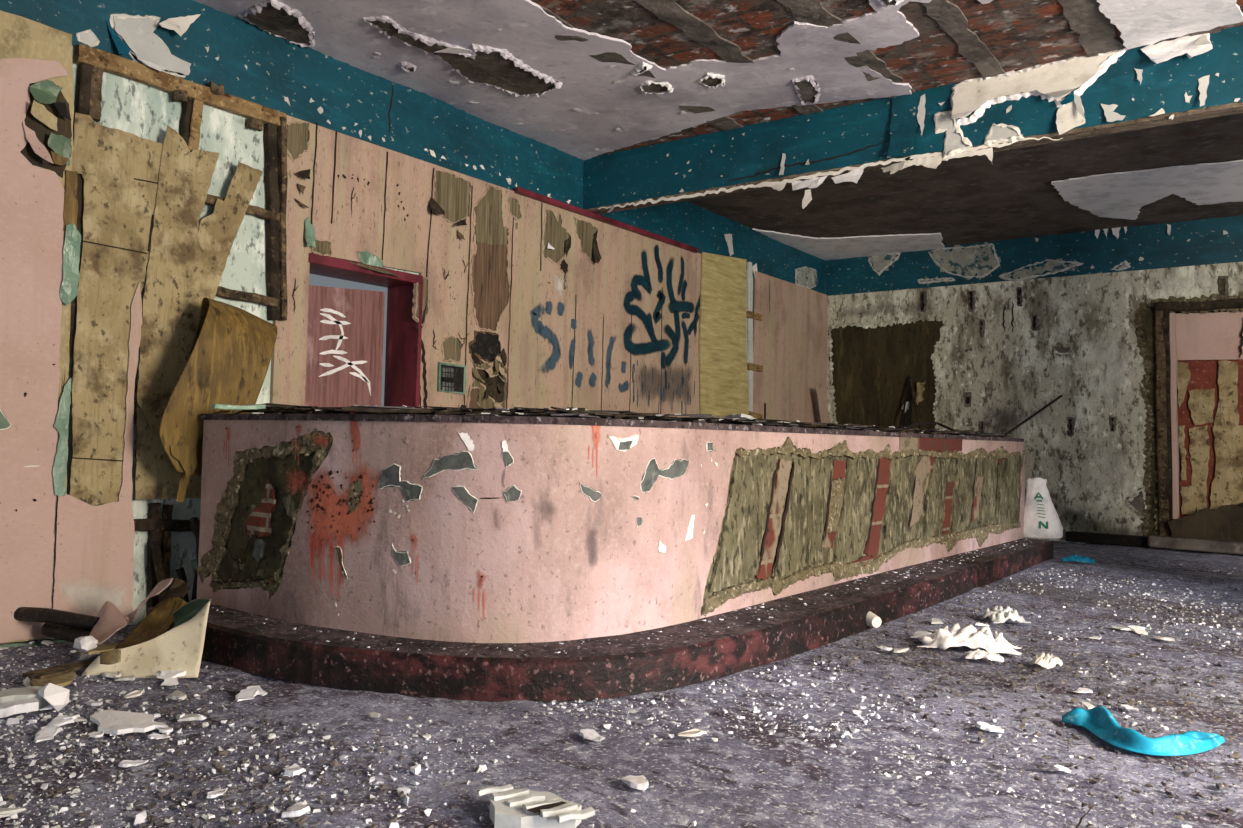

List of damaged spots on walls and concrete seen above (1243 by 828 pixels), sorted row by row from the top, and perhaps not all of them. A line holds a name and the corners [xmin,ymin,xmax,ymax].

peeling [76,14,201,78]
peeling [1134,33,1213,85]
flaking render [679,48,1243,285]
peeling [424,149,522,332]
peeling [537,189,602,288]
peeling [441,335,508,409]
damp [827,314,952,431]
flaking render [196,428,333,596]
corrosion [306,412,377,597]
peeling [377,432,478,518]
flaking render [632,437,1027,616]
damp [1066,510,1128,535]